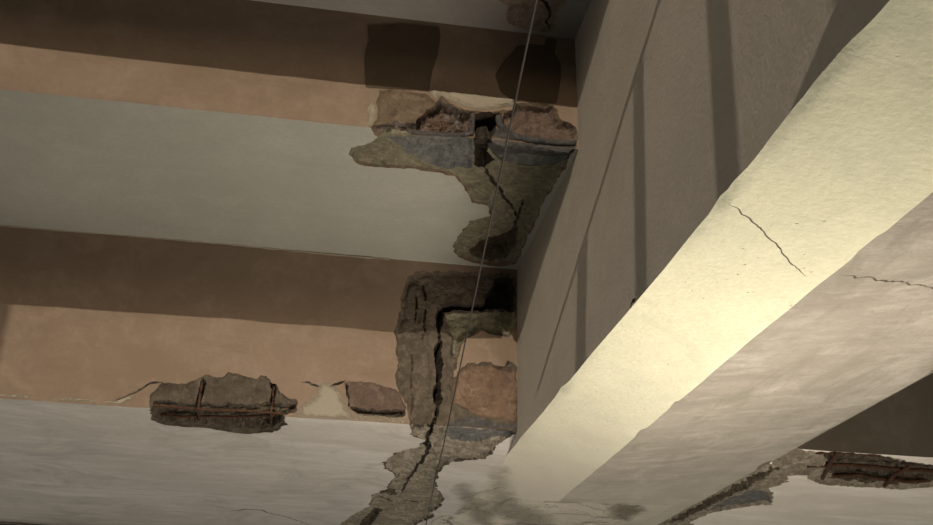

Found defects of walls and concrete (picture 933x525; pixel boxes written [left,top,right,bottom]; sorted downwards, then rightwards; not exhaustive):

flaking render [499,0,569,33]
crack [730,205,805,276]
spalling [340,89,578,525]
crack [844,275,933,289]
spalling [149,372,298,434]
spalling [658,448,933,525]